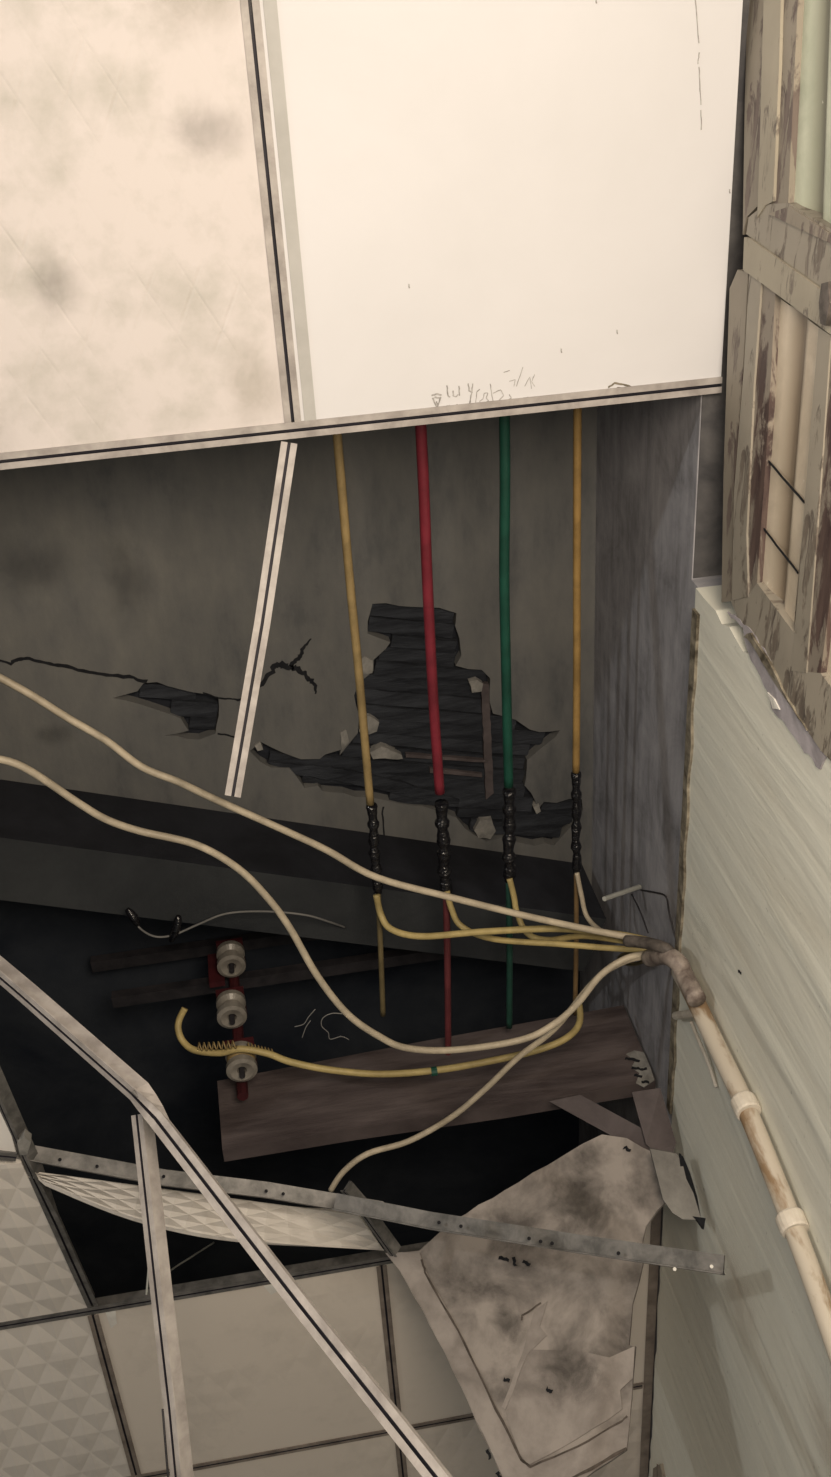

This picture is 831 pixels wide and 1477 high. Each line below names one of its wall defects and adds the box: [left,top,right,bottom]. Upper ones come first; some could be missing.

crack [0,657,148,683]
crack [203,639,317,738]
flaking render [253,603,581,839]